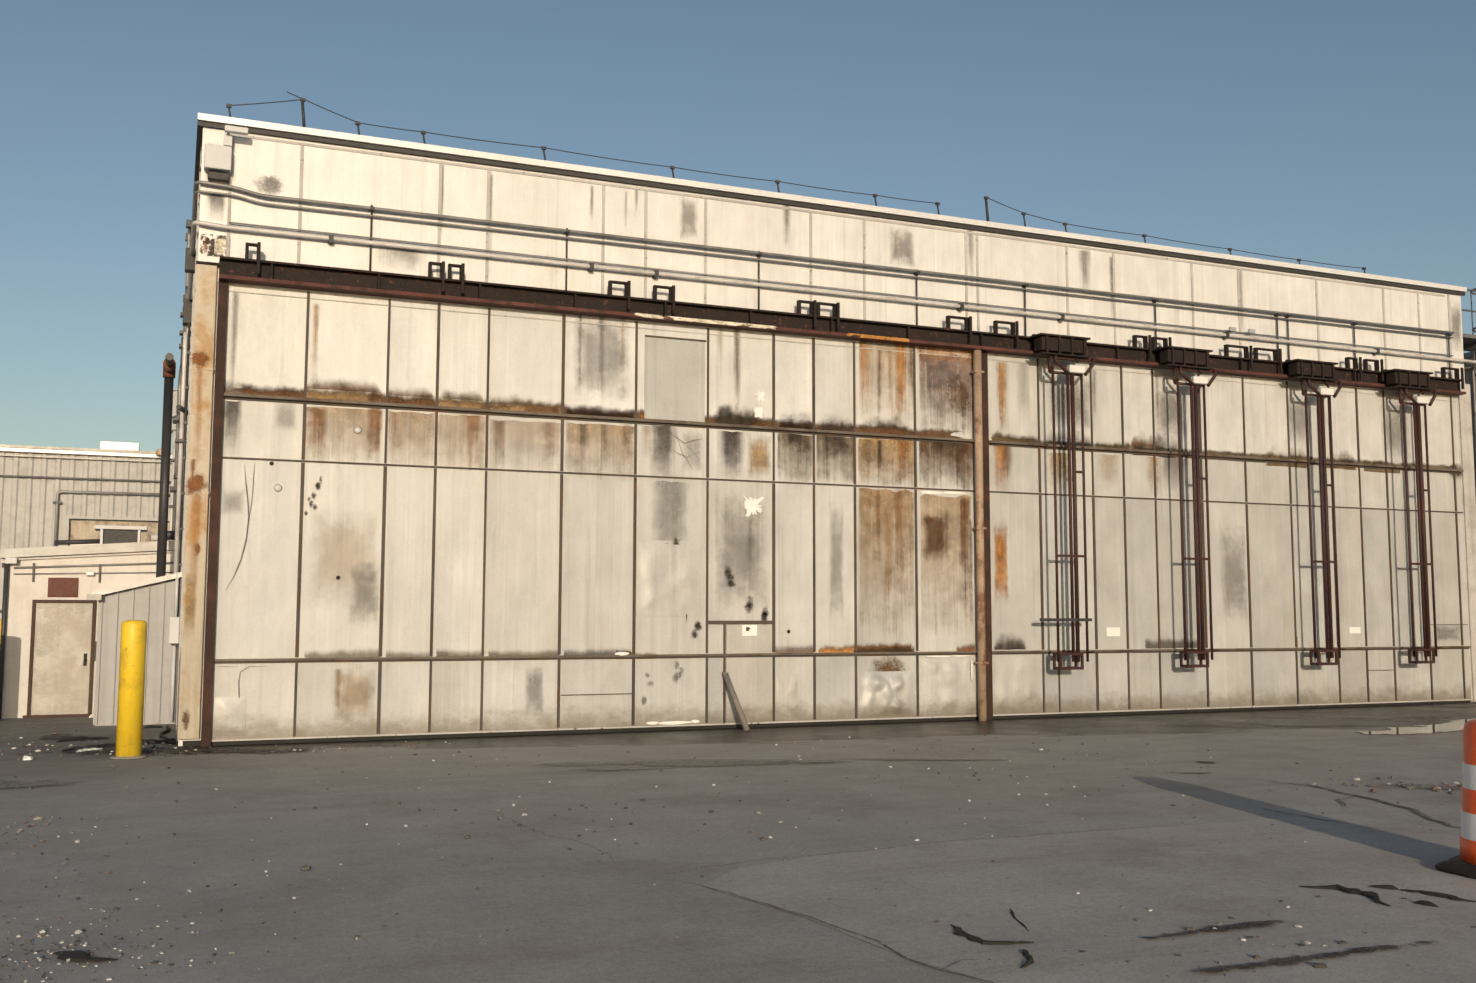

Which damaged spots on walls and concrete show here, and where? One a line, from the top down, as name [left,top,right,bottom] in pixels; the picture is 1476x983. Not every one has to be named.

rust [192,352,209,387]
rust [239,383,718,447]
water stain [656,426,671,458]
rust [760,341,974,583]
rust [995,437,1449,471]
rust [185,460,207,557]
rust [995,534,1007,591]
rust [186,579,195,620]